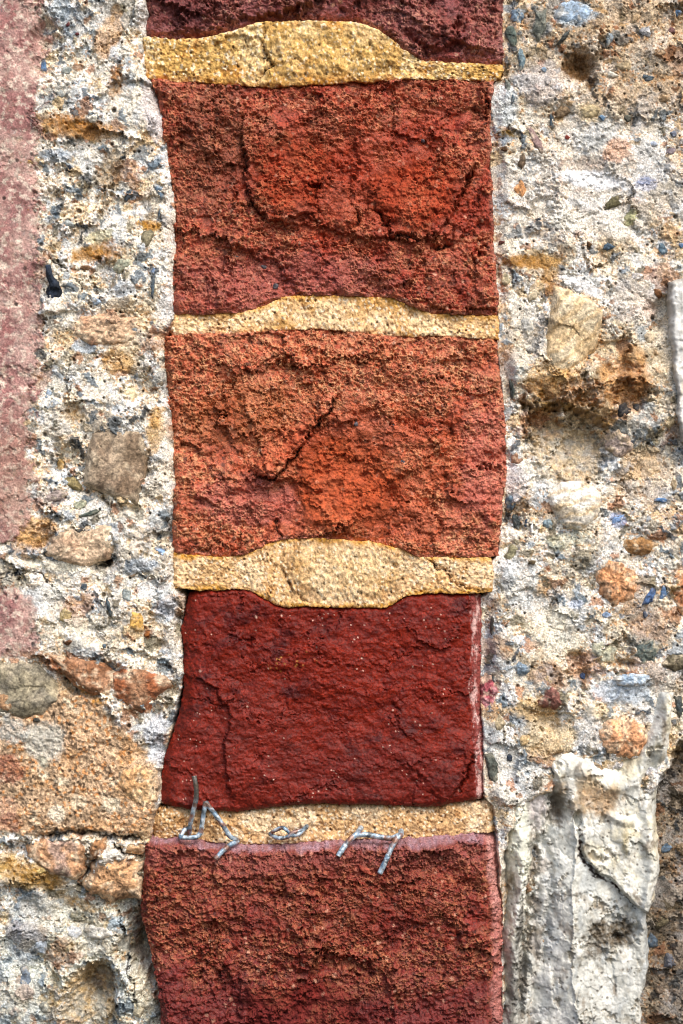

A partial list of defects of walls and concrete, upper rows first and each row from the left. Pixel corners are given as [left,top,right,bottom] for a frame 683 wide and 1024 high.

crack [258,403,333,481]
crack [577,819,633,907]